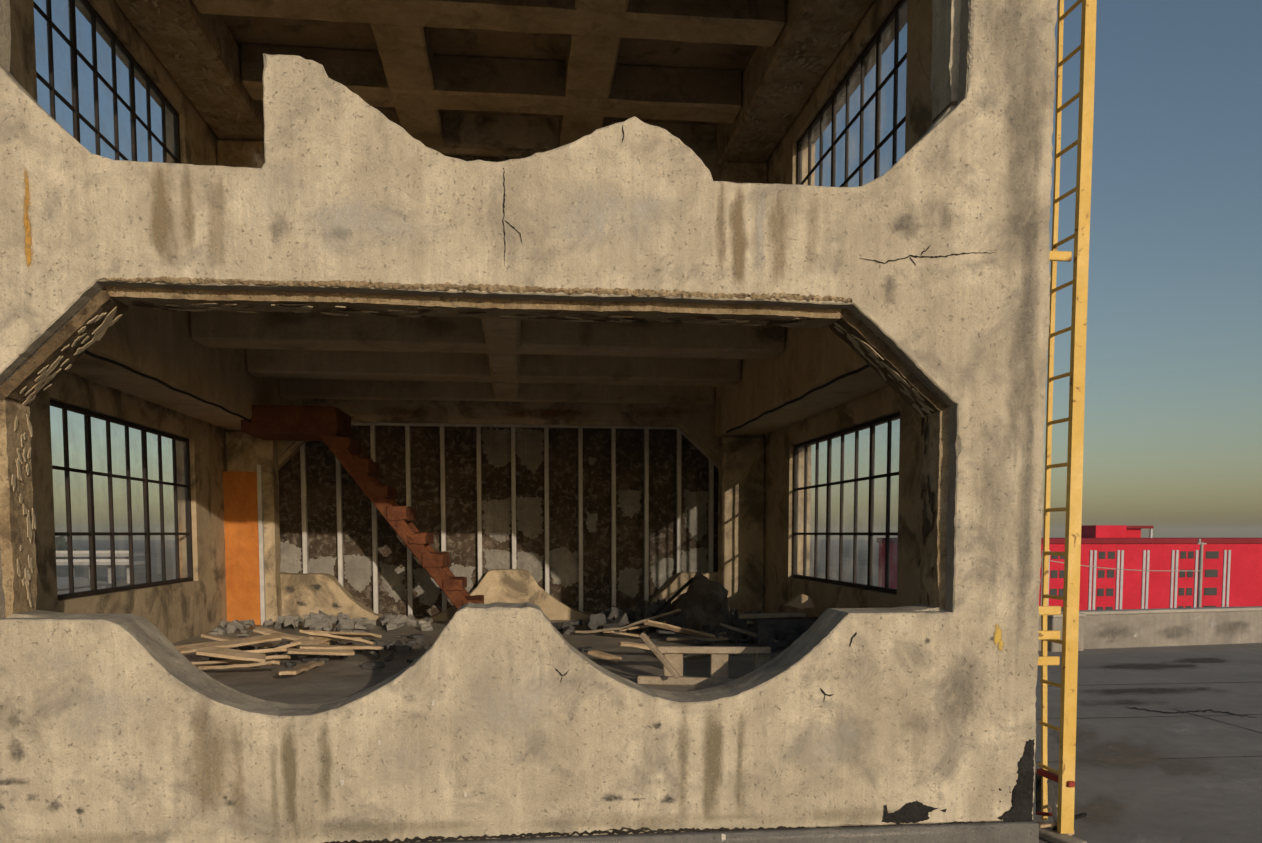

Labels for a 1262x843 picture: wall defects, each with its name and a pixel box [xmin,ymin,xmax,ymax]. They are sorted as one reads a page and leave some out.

water stain [152,171,170,251]
crack [502,168,522,265]
water stain [719,194,763,278]
crack [860,246,997,265]
water stain [283,737,296,822]
water stain [705,724,721,807]
spalling [882,801,946,824]
spalling [998,739,1035,822]